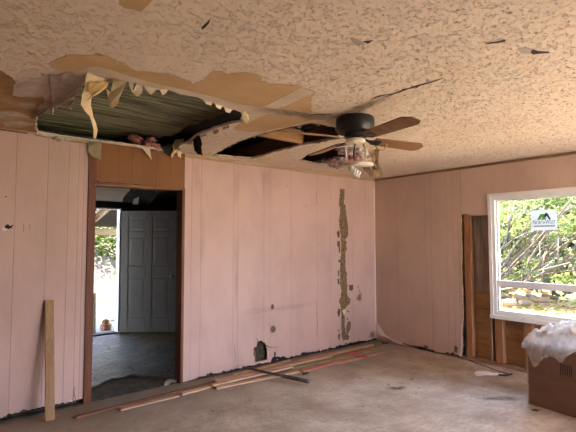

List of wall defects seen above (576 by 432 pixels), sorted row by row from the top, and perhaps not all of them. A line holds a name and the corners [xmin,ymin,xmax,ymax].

crack [373,78,443,99]
peeling [313,189,361,352]
spalling [253,338,306,364]